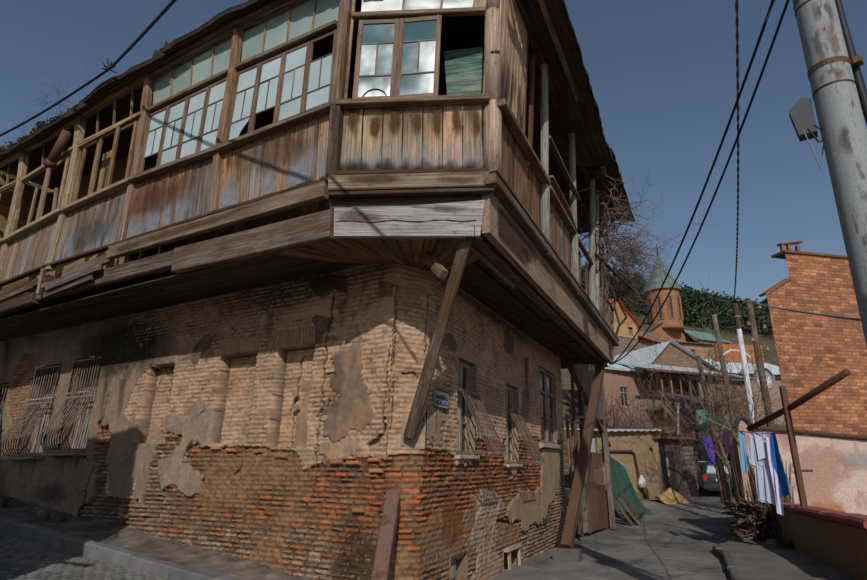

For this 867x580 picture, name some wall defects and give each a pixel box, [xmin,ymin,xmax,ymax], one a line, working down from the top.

damp [84,320,158,377]
crack [281,295,336,496]
spalling [79,322,567,580]
crack [367,286,429,447]